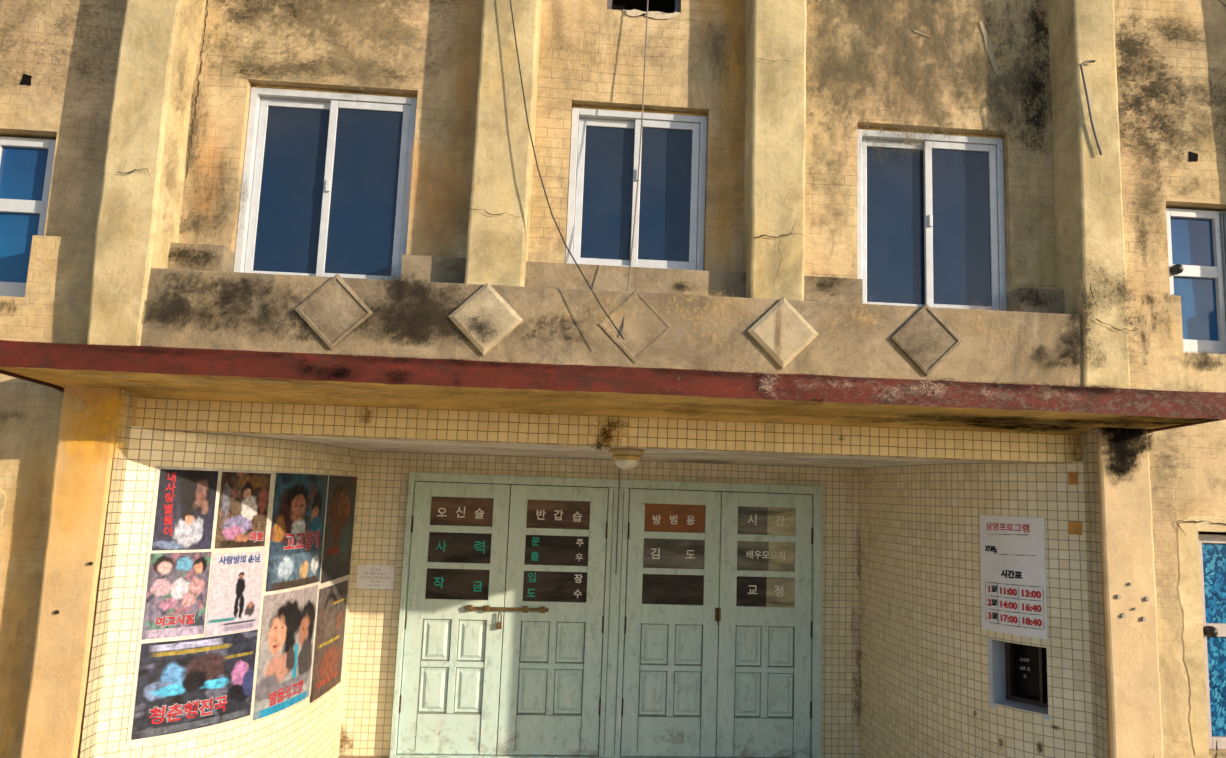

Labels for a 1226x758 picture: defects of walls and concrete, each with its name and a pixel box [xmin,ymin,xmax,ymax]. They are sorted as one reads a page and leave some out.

damp [220,0,413,83]
damp [807,0,1052,150]
damp [1115,17,1224,260]
damp [812,272,845,292]
damp [1034,268,1173,367]
damp [301,360,353,380]
peeling [879,380,947,400]
damp [1046,384,1122,393]
damp [1186,352,1222,370]
damp [593,408,626,449]
damp [861,413,1217,481]